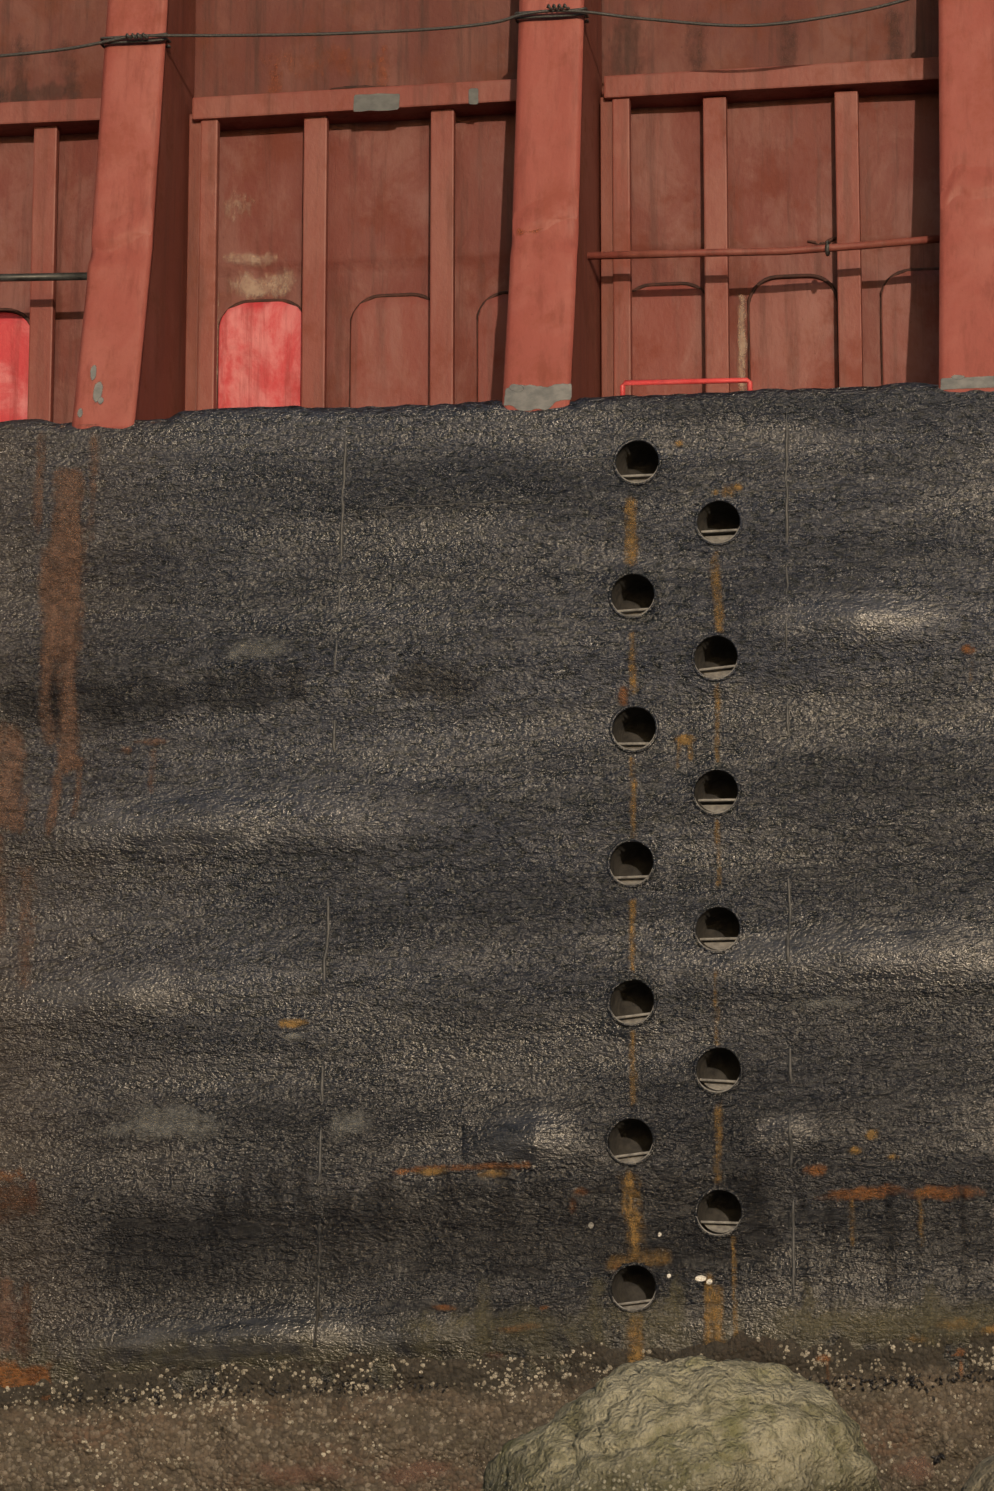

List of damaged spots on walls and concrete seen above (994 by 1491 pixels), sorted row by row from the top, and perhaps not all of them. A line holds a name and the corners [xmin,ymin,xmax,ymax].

damp [109,1166,772,1294]
rust [607,1173,671,1269]
rust [834,1185,895,1207]
rust [914,1186,971,1214]